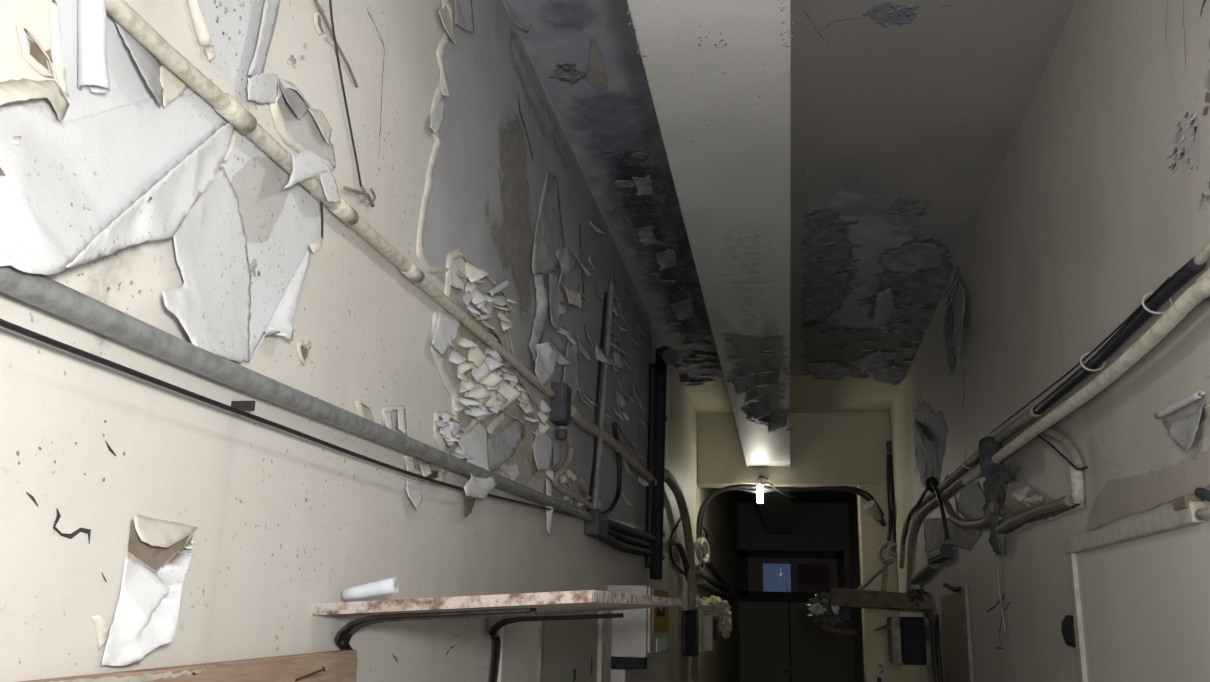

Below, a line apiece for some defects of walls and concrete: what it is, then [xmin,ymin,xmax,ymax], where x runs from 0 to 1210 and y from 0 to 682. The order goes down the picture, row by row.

peeling [0,0,340,366]